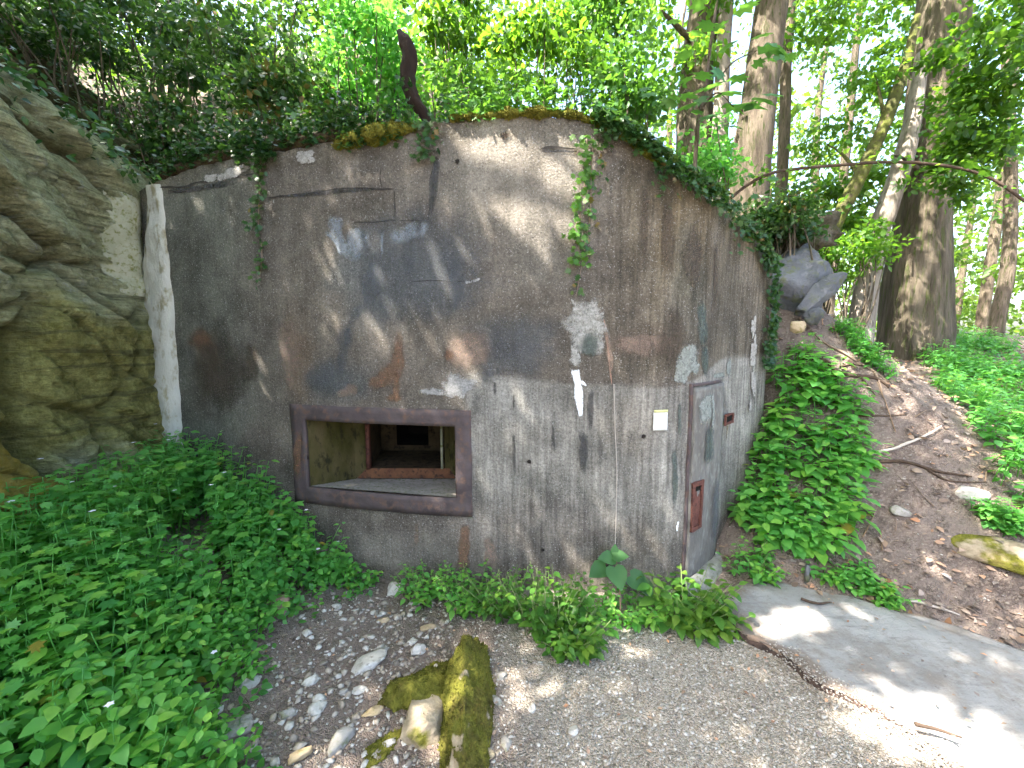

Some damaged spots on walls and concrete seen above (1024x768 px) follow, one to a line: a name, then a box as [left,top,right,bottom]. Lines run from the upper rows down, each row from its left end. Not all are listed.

crack [267,157,439,223]
water stain [561,300,609,471]